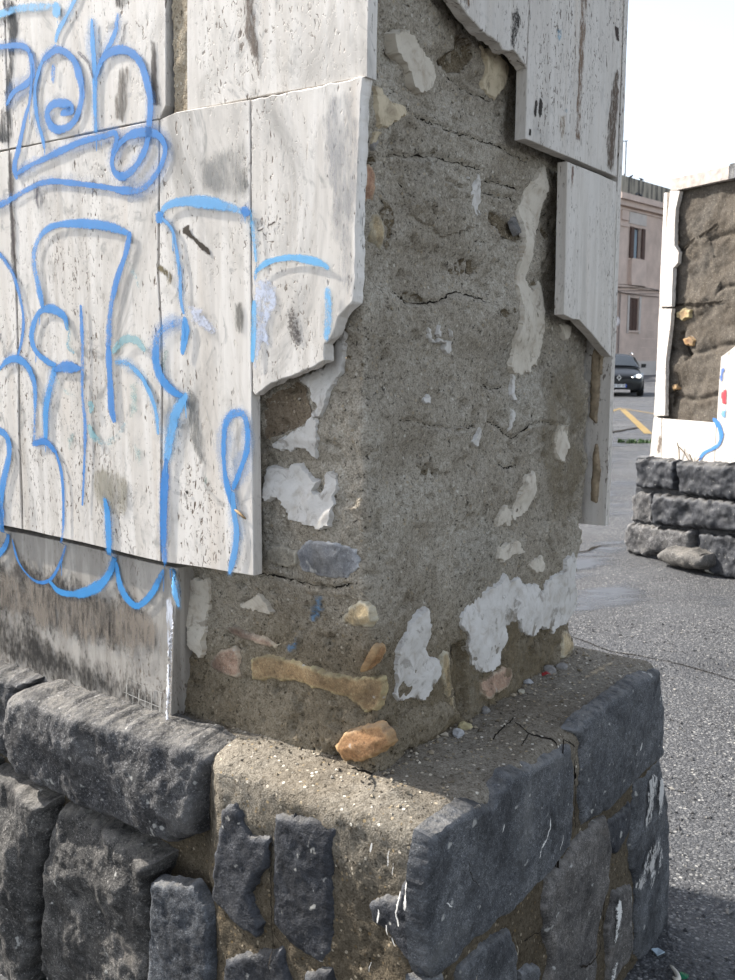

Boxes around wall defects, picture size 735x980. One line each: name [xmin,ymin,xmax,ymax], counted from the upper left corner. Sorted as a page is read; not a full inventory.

peeling [384,29,509,101]
peeling [365,86,407,251]
crack [392,291,488,304]
peeling [466,164,549,375]
spalling [676,231,722,321]
peeling [262,330,365,578]
crack [465,415,553,439]
peeling [494,470,537,527]
peeling [552,424,570,463]
damp [0,575,155,648]
damp [165,599,173,720]
peeling [211,540,578,762]